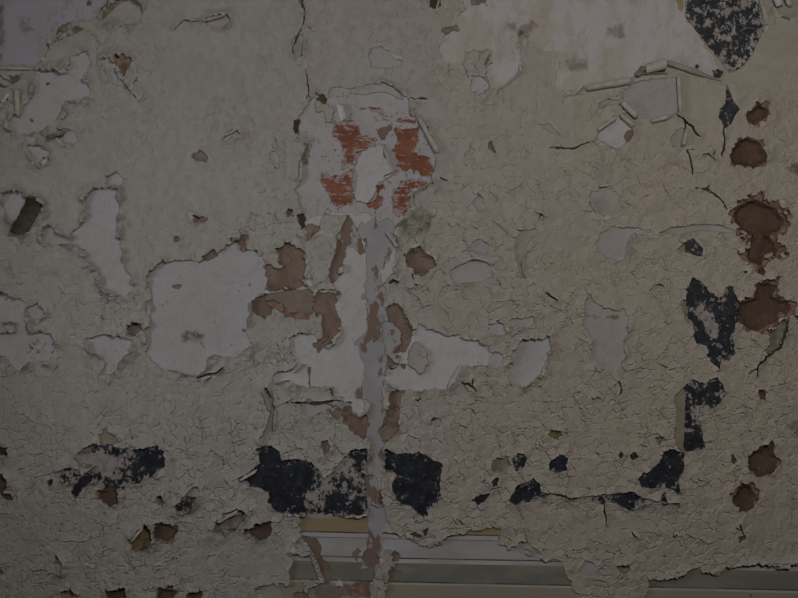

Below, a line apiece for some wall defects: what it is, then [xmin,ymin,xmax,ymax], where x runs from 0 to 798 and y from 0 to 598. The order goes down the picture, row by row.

peeling [0,0,144,168]
peeling [440,0,723,117]
peeling [594,96,635,153]
crack [676,113,729,215]
peeling [86,82,439,443]
flaking render [729,191,798,362]
peeling [378,303,493,441]
crack [749,319,789,377]
peeling [385,472,397,488]
crack [547,492,579,500]
peeling [369,548,395,598]